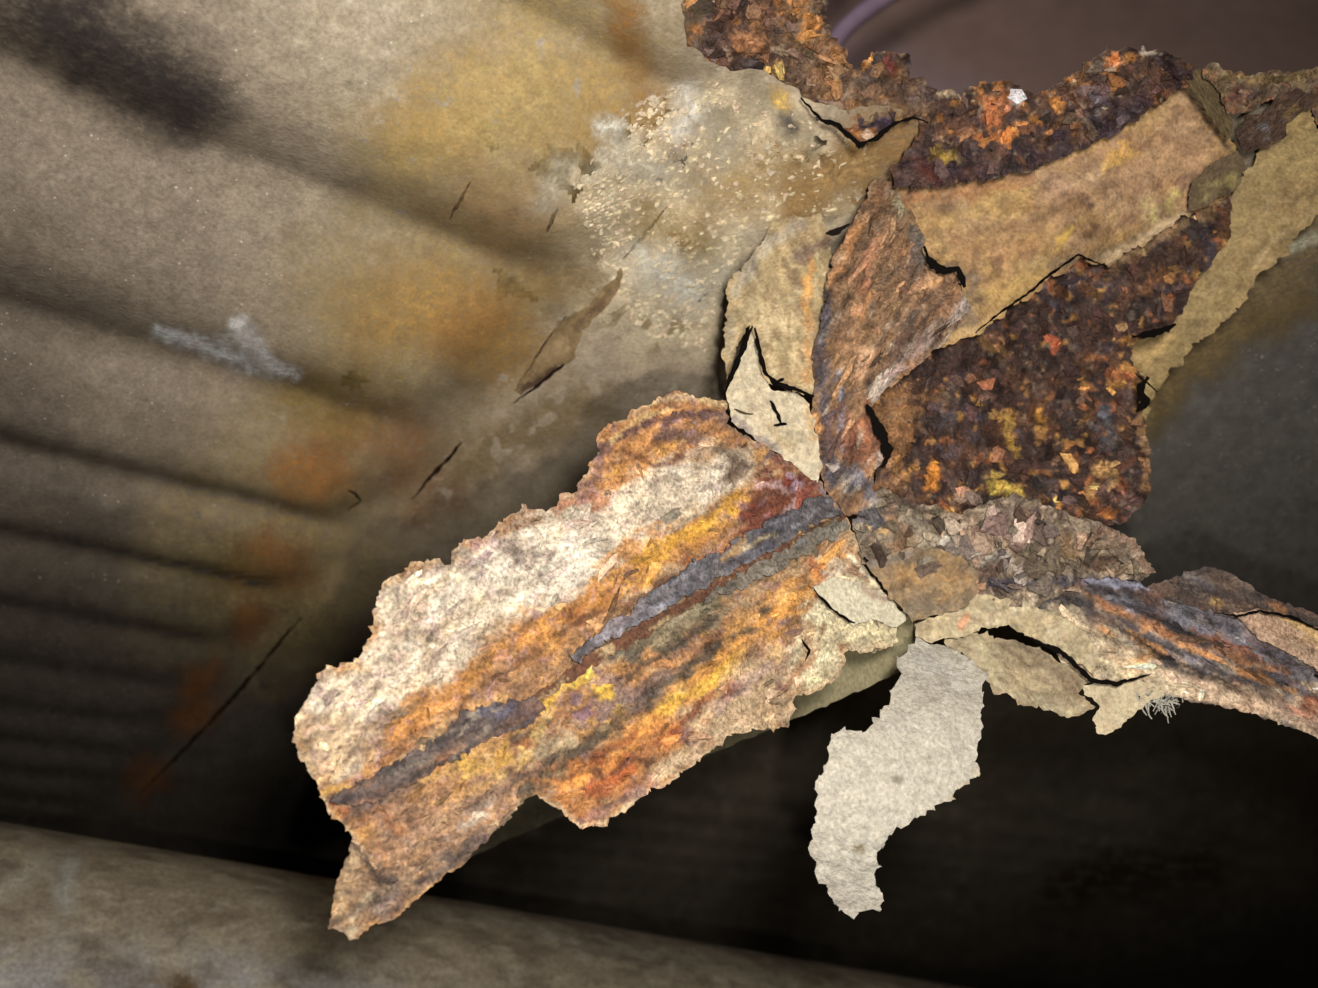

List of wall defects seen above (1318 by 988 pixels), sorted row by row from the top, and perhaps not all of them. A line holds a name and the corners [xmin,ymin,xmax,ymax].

damp [0,0,228,133]
damp [213,319,276,374]
crack [449,182,471,219]
crack [546,209,558,232]
peeling [513,80,873,482]
peeling [896,69,1236,349]
crack [412,442,462,499]
corrosion [291,0,1318,941]
crack [139,617,303,794]
peeling [808,631,1095,920]